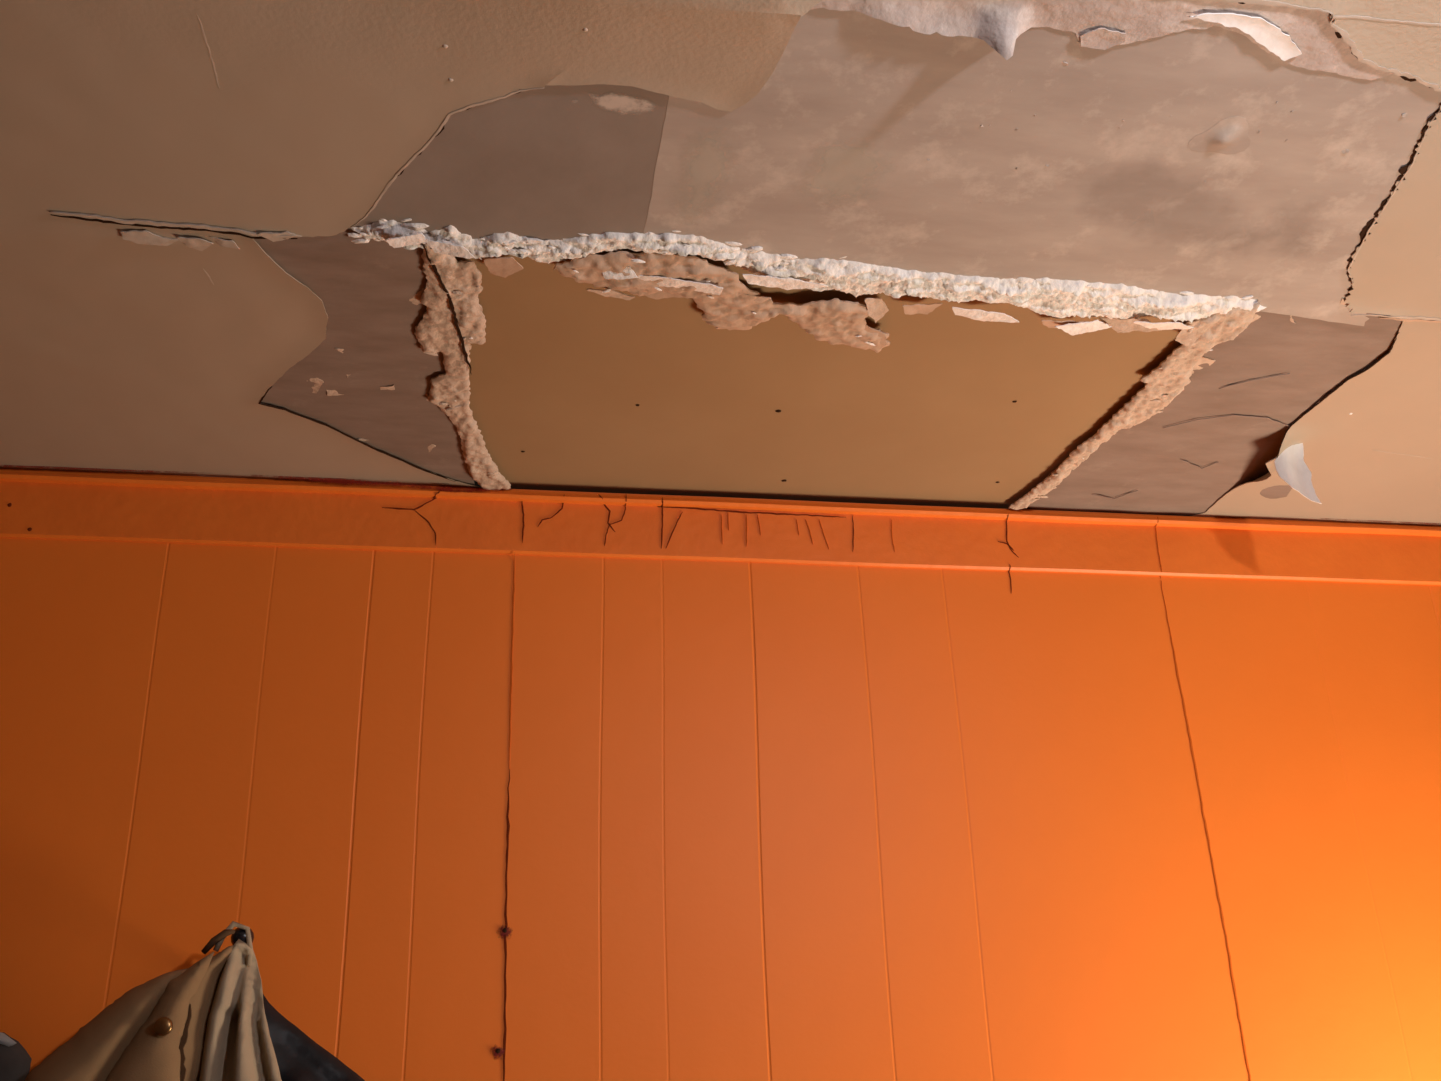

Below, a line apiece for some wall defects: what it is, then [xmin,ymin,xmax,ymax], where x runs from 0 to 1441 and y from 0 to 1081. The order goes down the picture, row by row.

crack [1332,15,1441,26]
peeling [254,0,1441,516]
crack [382,484,449,542]
crack [598,494,854,549]
crack [998,513,1019,592]
crack [503,503,564,1081]